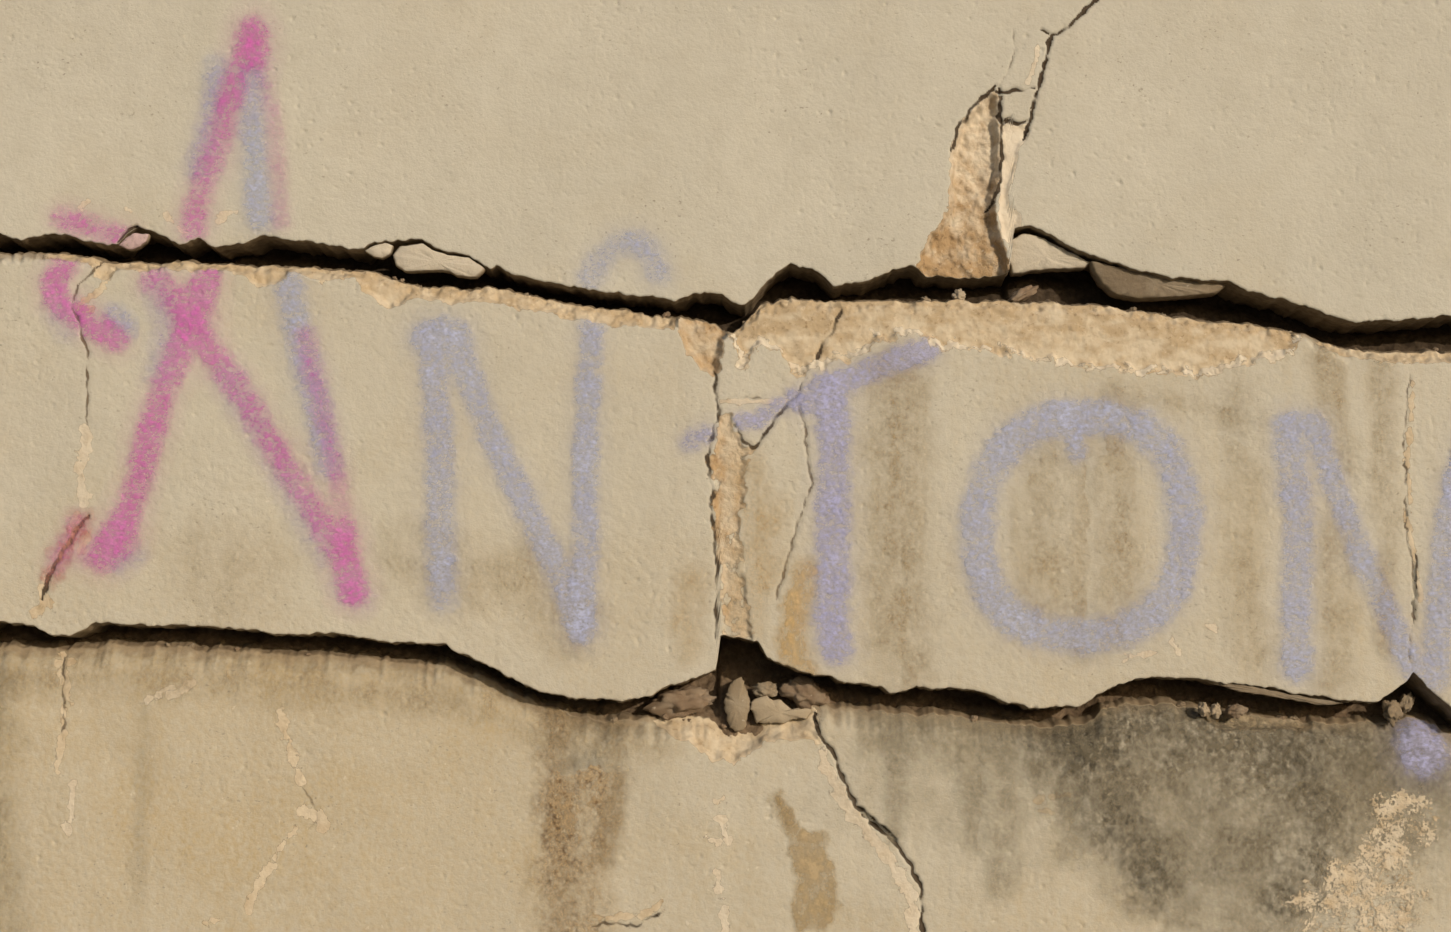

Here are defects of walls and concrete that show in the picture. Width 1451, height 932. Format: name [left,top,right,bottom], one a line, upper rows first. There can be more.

crack [950,0,1099,213]
spalling [43,91,1451,380]
crack [0,226,1451,932]
spalling [705,412,756,639]
spalling [653,706,821,766]
damp [776,796,836,931]
damp [1031,705,1437,918]